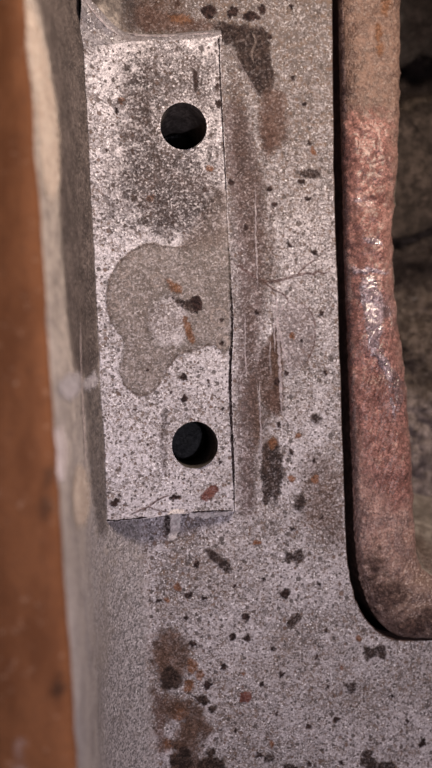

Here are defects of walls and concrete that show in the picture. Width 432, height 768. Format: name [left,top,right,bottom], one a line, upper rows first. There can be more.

rust [249,329,295,505]
rust [152,628,225,768]